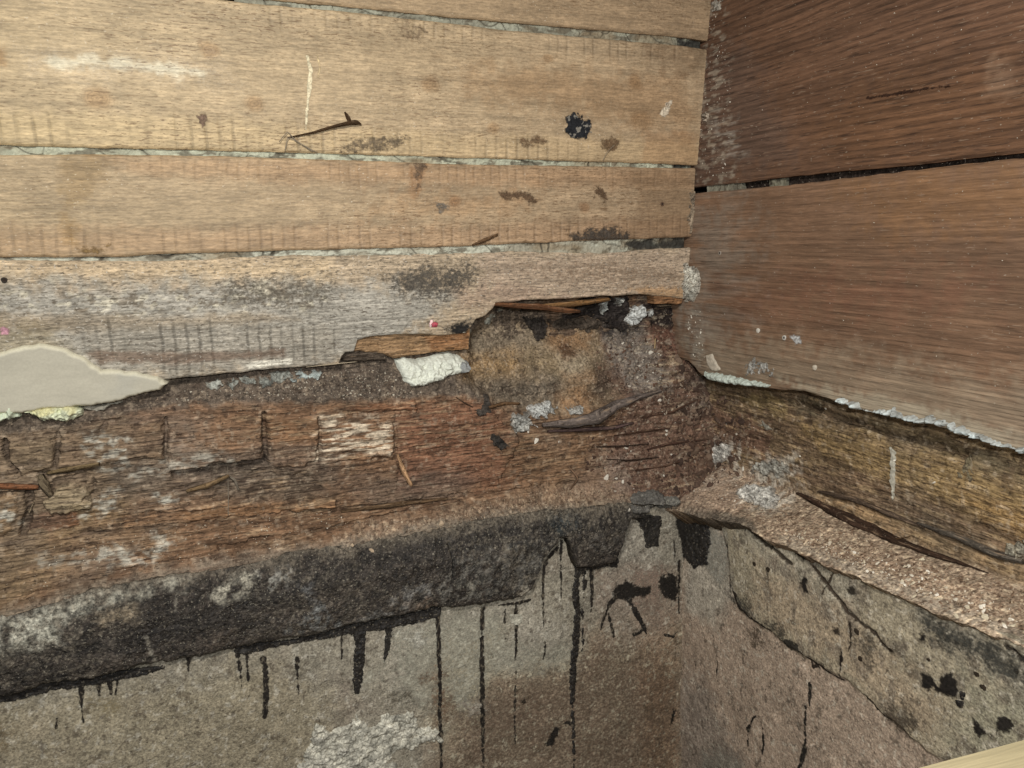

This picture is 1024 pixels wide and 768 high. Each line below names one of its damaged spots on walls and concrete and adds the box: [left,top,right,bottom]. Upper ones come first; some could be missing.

leakage [382,260,483,301]
spalling [647,295,683,304]
leakage [631,565,666,619]
crack [732,589,772,632]
crack [754,533,890,681]
leakage [361,608,680,768]